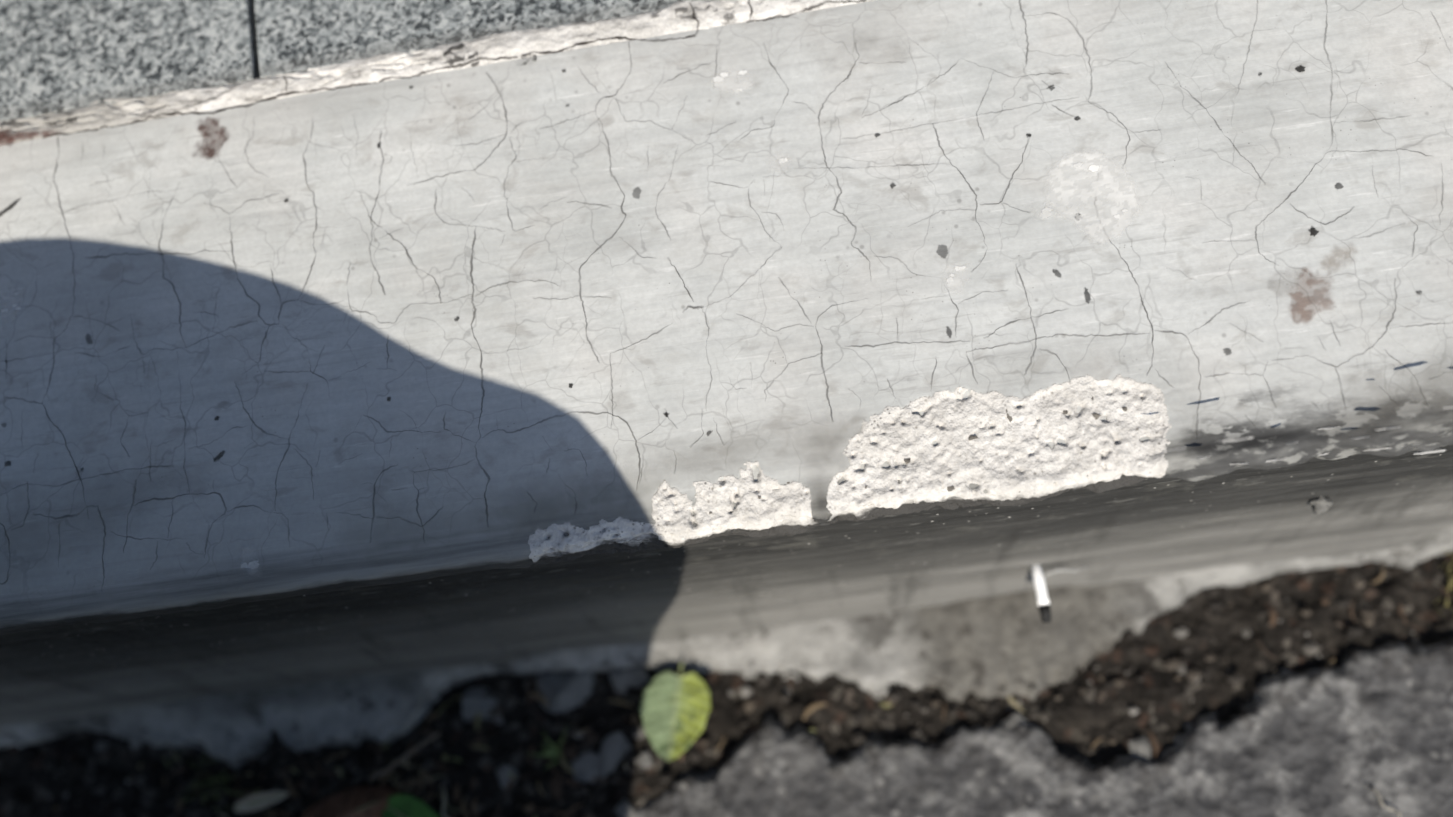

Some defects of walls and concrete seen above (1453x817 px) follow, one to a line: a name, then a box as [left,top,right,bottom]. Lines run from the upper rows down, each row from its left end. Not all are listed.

crack [748,0,865,22]
corrosion [198,120,227,157]
crack [44,9,699,298]
spalling [1318,415,1446,455]
spalling [528,374,1253,567]
spalling [1310,496,1333,515]